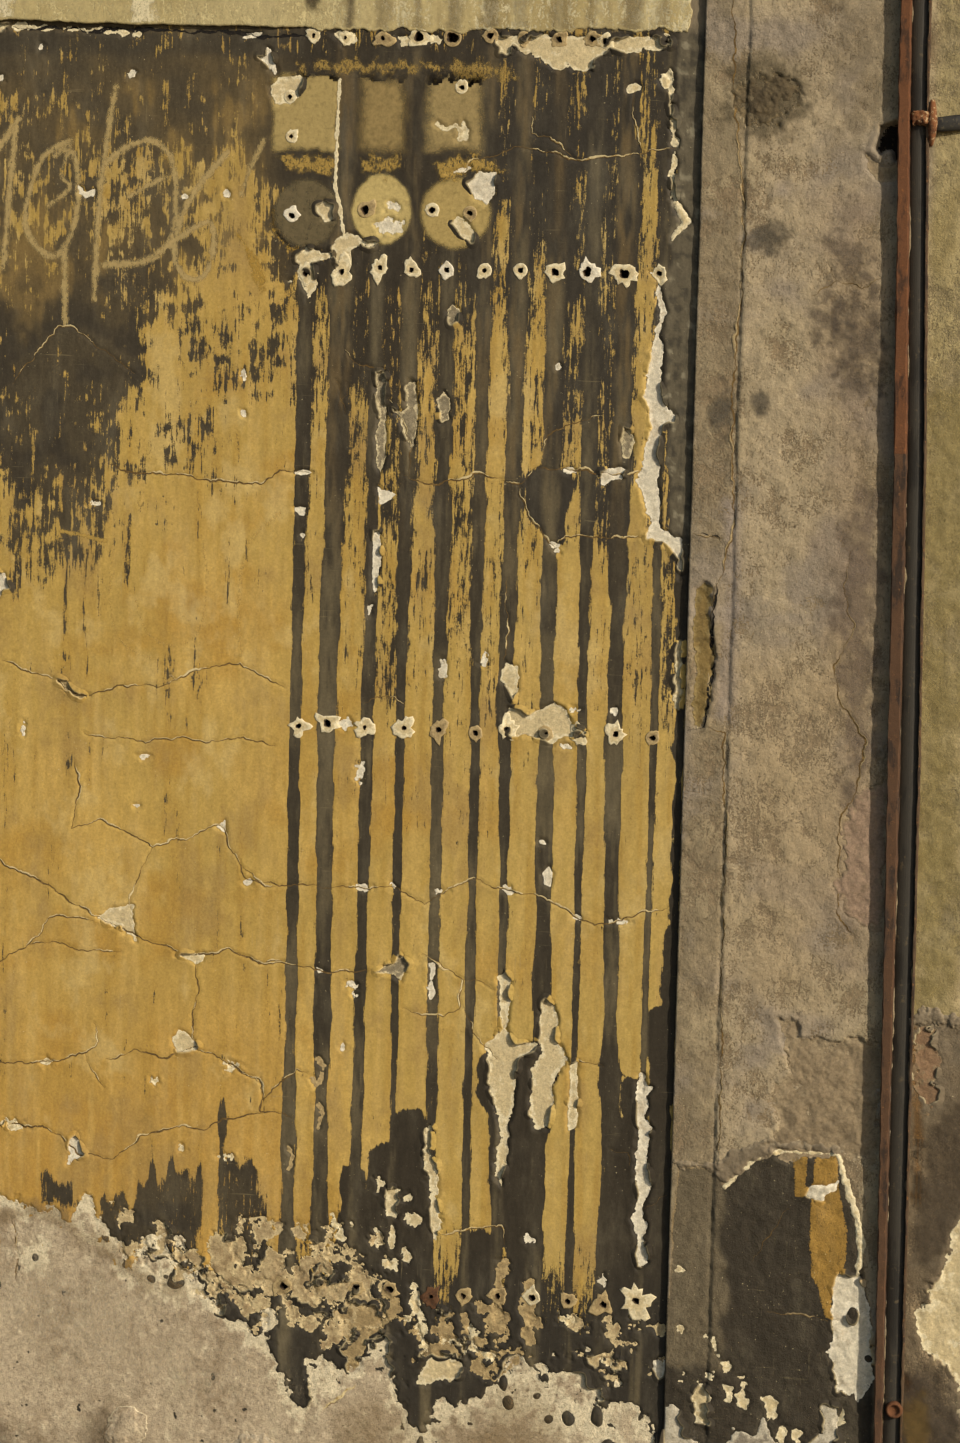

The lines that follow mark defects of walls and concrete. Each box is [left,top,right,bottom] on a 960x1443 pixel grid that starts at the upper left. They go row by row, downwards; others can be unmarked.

flaking render [487,30,692,241]
water stain [733,61,803,137]
crack [4,660,279,696]
crack [0,734,667,1160]
peeling [109,1123,543,1386]
water stain [0,1193,698,1443]
peeling [558,1273,684,1387]
peeling [647,1334,803,1443]
water stain [726,1417,778,1443]
spalling [722,1019,881,1426]
water stain [802,1399,843,1443]
flaking render [914,1220,960,1392]